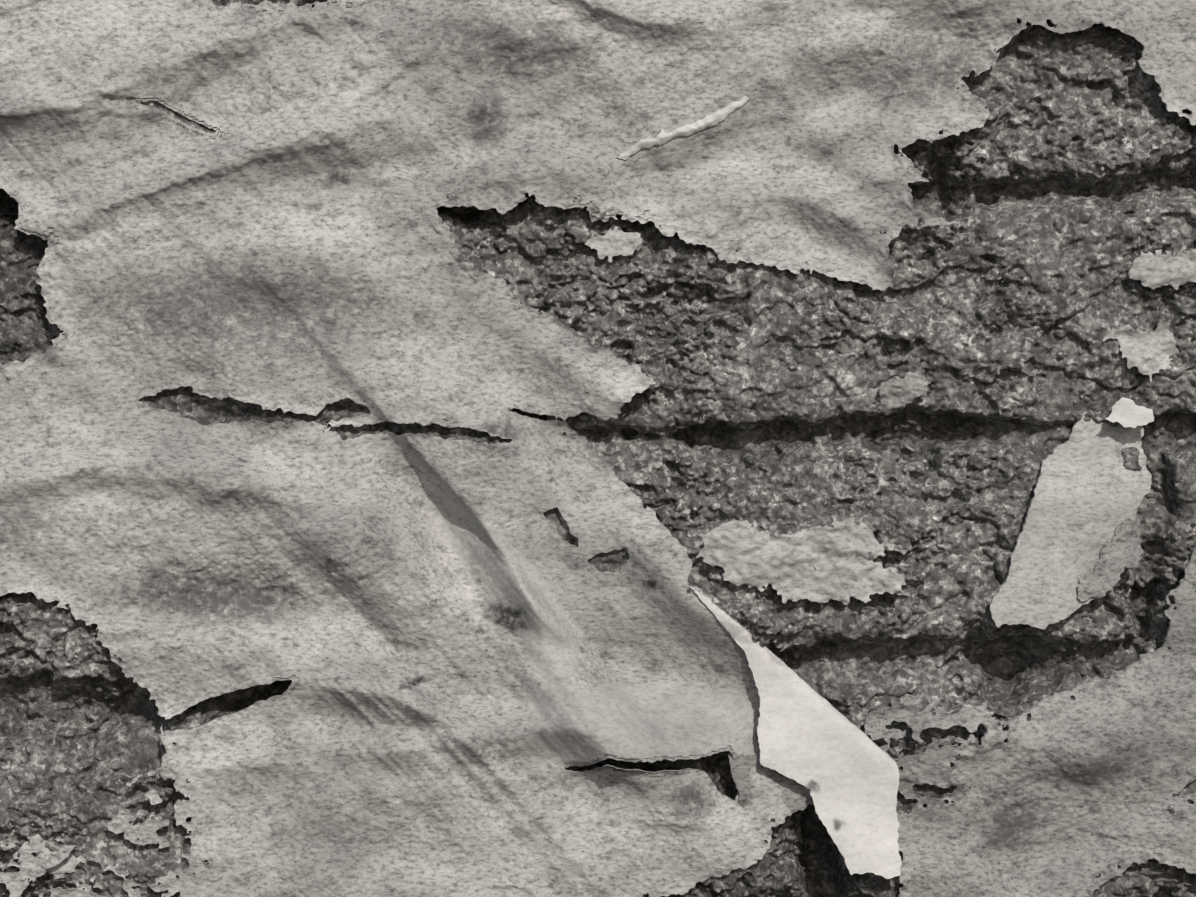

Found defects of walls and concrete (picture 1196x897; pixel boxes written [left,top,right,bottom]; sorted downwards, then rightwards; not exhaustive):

peeling [0,0,1196,698]
crack [139,386,569,445]
crack [201,680,292,725]
peeling [0,485,902,897]
crack [565,751,738,800]
spalling [1057,836,1196,897]